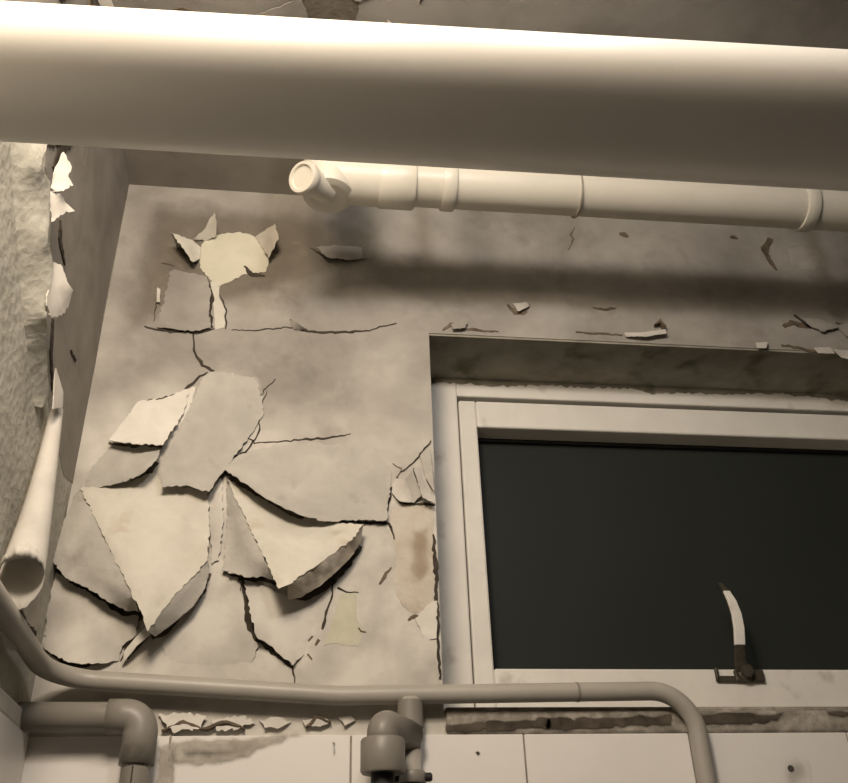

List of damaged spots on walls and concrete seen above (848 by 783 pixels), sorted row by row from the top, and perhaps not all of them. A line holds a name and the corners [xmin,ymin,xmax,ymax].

flaking render [257,0,362,21]
flaking render [782,314,848,337]
crack [144,318,397,372]
flaking render [781,344,848,359]
peeling [0,142,441,678]
peeling [158,712,291,734]
peeling [302,715,355,728]